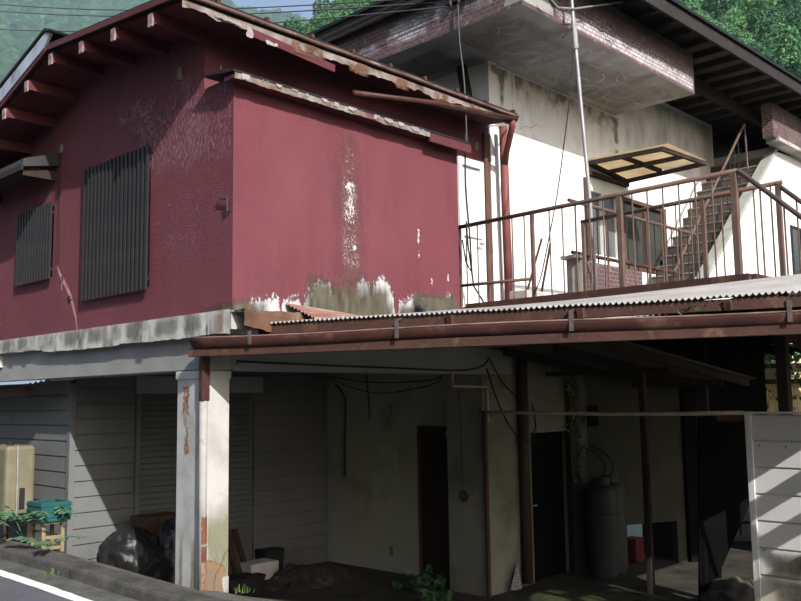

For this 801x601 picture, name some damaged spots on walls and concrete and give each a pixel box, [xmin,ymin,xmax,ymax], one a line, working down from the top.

corrosion [350,63,368,76]
damp [406,53,461,77]
damp [465,12,693,153]
peeling [341,160,429,314]
peeling [250,279,331,313]
spalling [201,517,229,593]